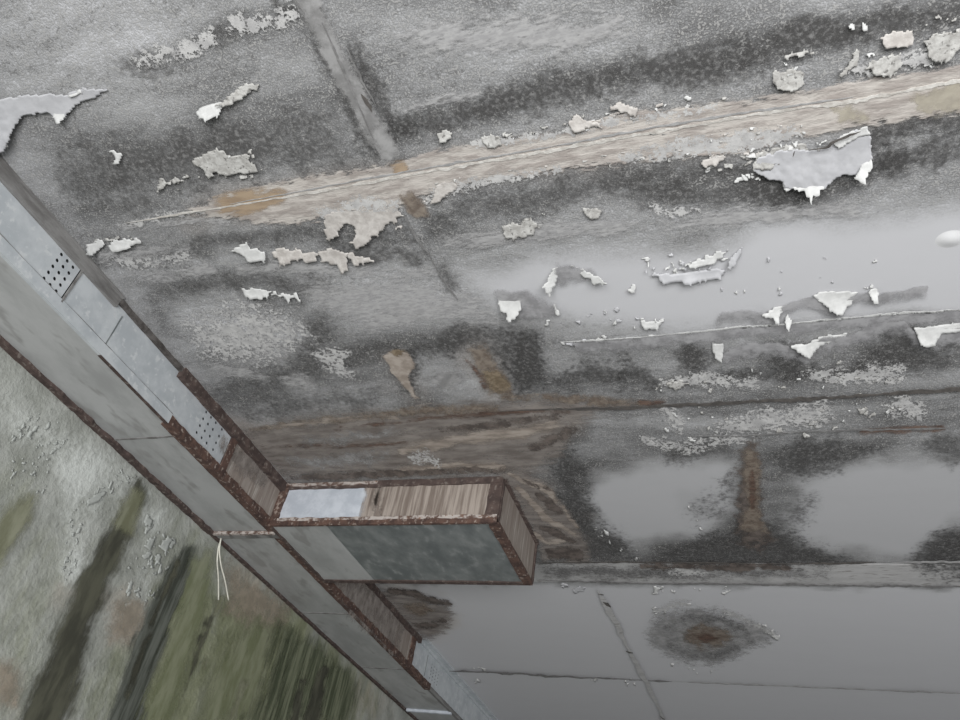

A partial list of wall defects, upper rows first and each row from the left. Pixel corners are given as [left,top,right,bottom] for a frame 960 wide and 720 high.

peeling [0,87,107,153]
spalling [156,15,960,274]
corrosion [217,189,285,216]
peeling [241,288,301,303]
peeling [641,247,743,292]
leakage [58,111,960,582]
peeling [561,277,960,389]
peeling [655,380,691,395]
peeling [832,393,904,430]
corrosion [221,437,268,485]
corrosion [729,441,777,552]
leakage [648,599,775,666]